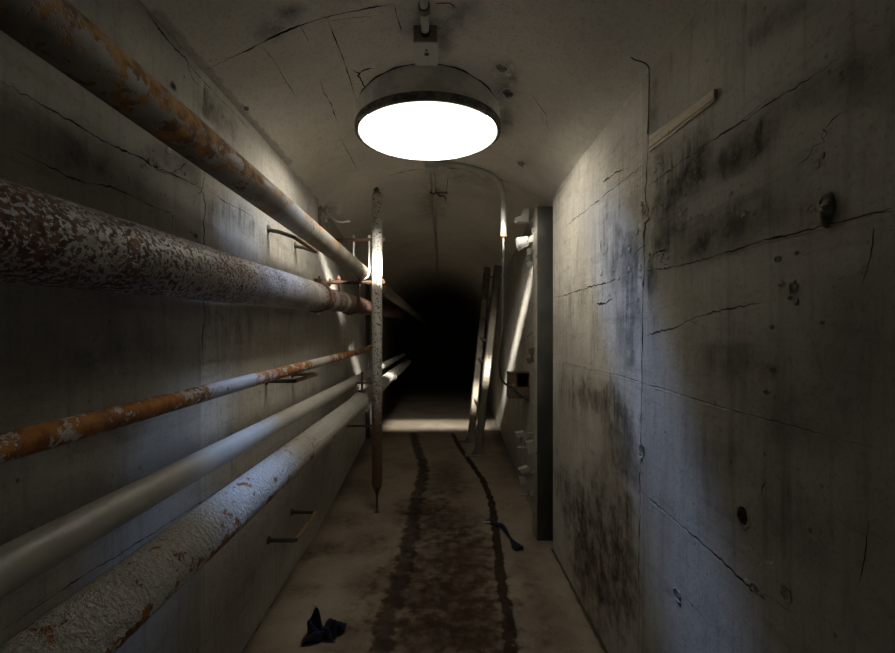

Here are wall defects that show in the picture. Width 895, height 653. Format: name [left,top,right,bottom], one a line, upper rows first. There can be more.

crack [147,4,415,127]
crack [438,64,494,95]
crack [1,80,248,245]
crack [555,59,894,456]
water stain [395,433,519,653]
water stain [551,549,608,653]
crack [638,436,792,613]